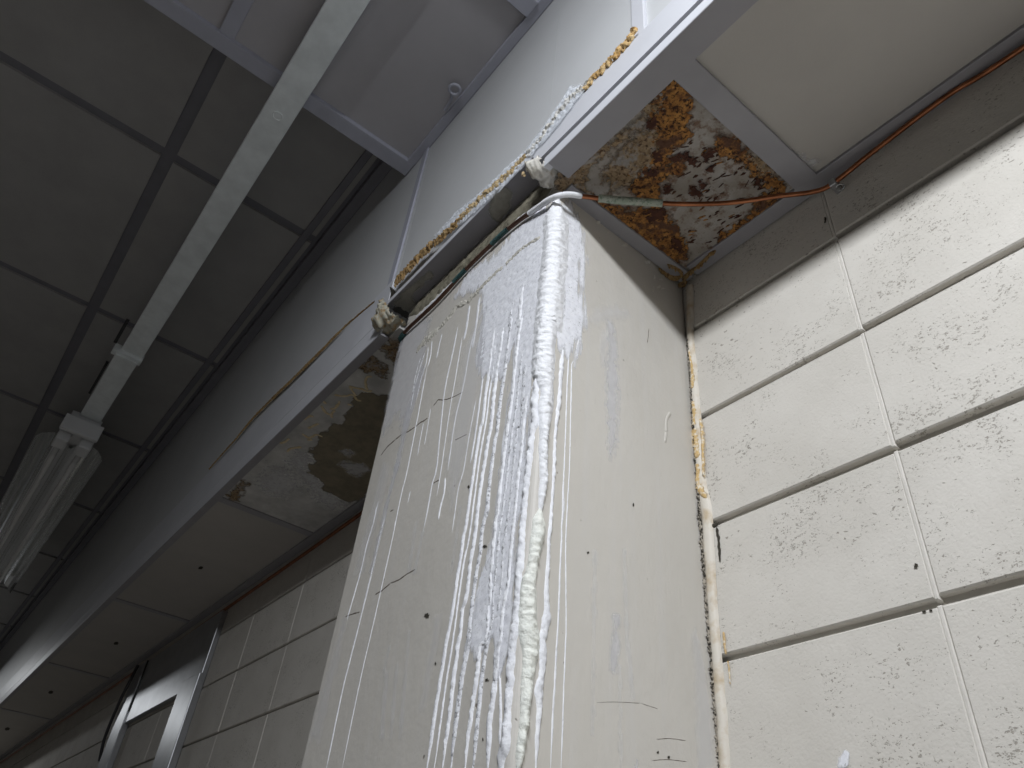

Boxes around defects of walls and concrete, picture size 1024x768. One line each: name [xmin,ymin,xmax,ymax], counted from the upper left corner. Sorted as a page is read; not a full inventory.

rust [554,80,787,288]
damp [262,376,390,507]
crack [345,569,415,617]